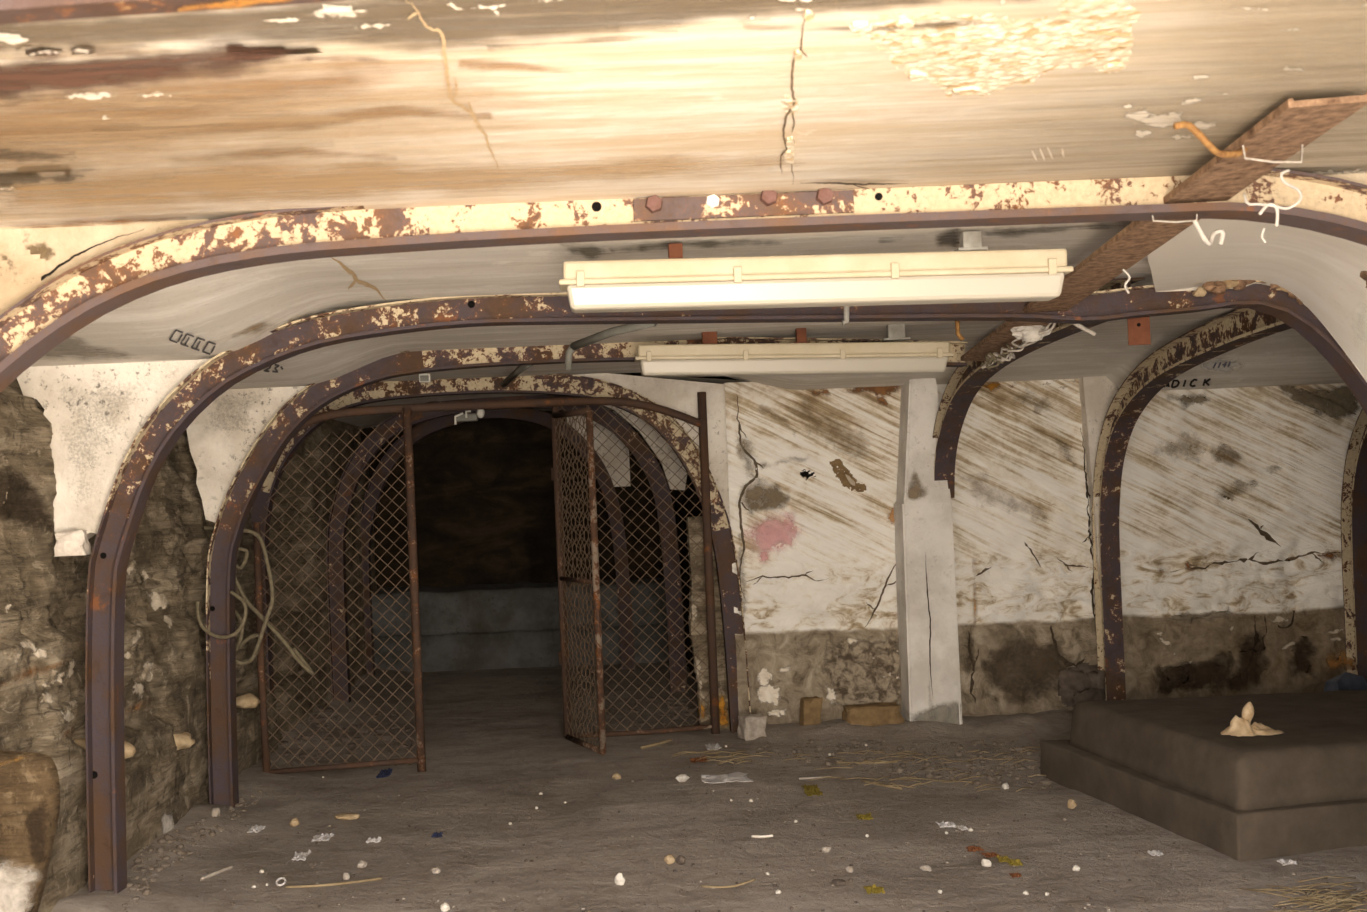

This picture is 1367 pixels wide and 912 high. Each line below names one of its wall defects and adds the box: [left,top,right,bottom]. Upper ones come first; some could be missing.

rust [179,0,287,11]
peeling [266,5,390,29]
peeling [447,2,506,16]
spalling [848,0,1142,98]
crack [780,7,907,189]
rust [32,218,169,228]
rust [848,385,902,406]
crack [736,396,826,601]
crack [1172,519,1341,572]
leakage [1172,610,1228,621]
leakage [966,639,1069,701]
leakage [1156,634,1266,695]